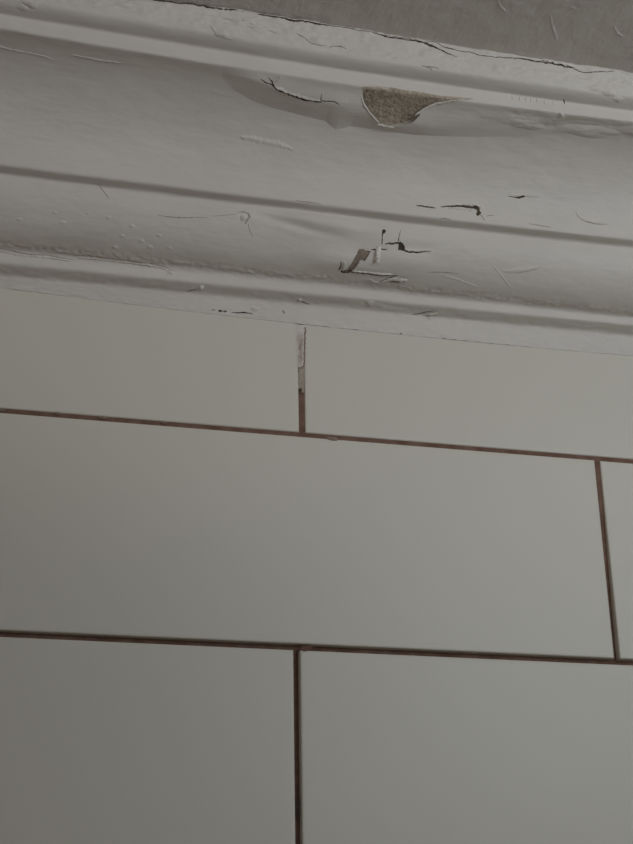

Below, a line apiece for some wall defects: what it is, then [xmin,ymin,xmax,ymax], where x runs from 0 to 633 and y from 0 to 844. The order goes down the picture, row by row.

crack [154,0,612,73]
crack [261,76,340,105]
peeling [361,86,470,128]
crack [416,203,495,221]
peeling [338,229,431,283]